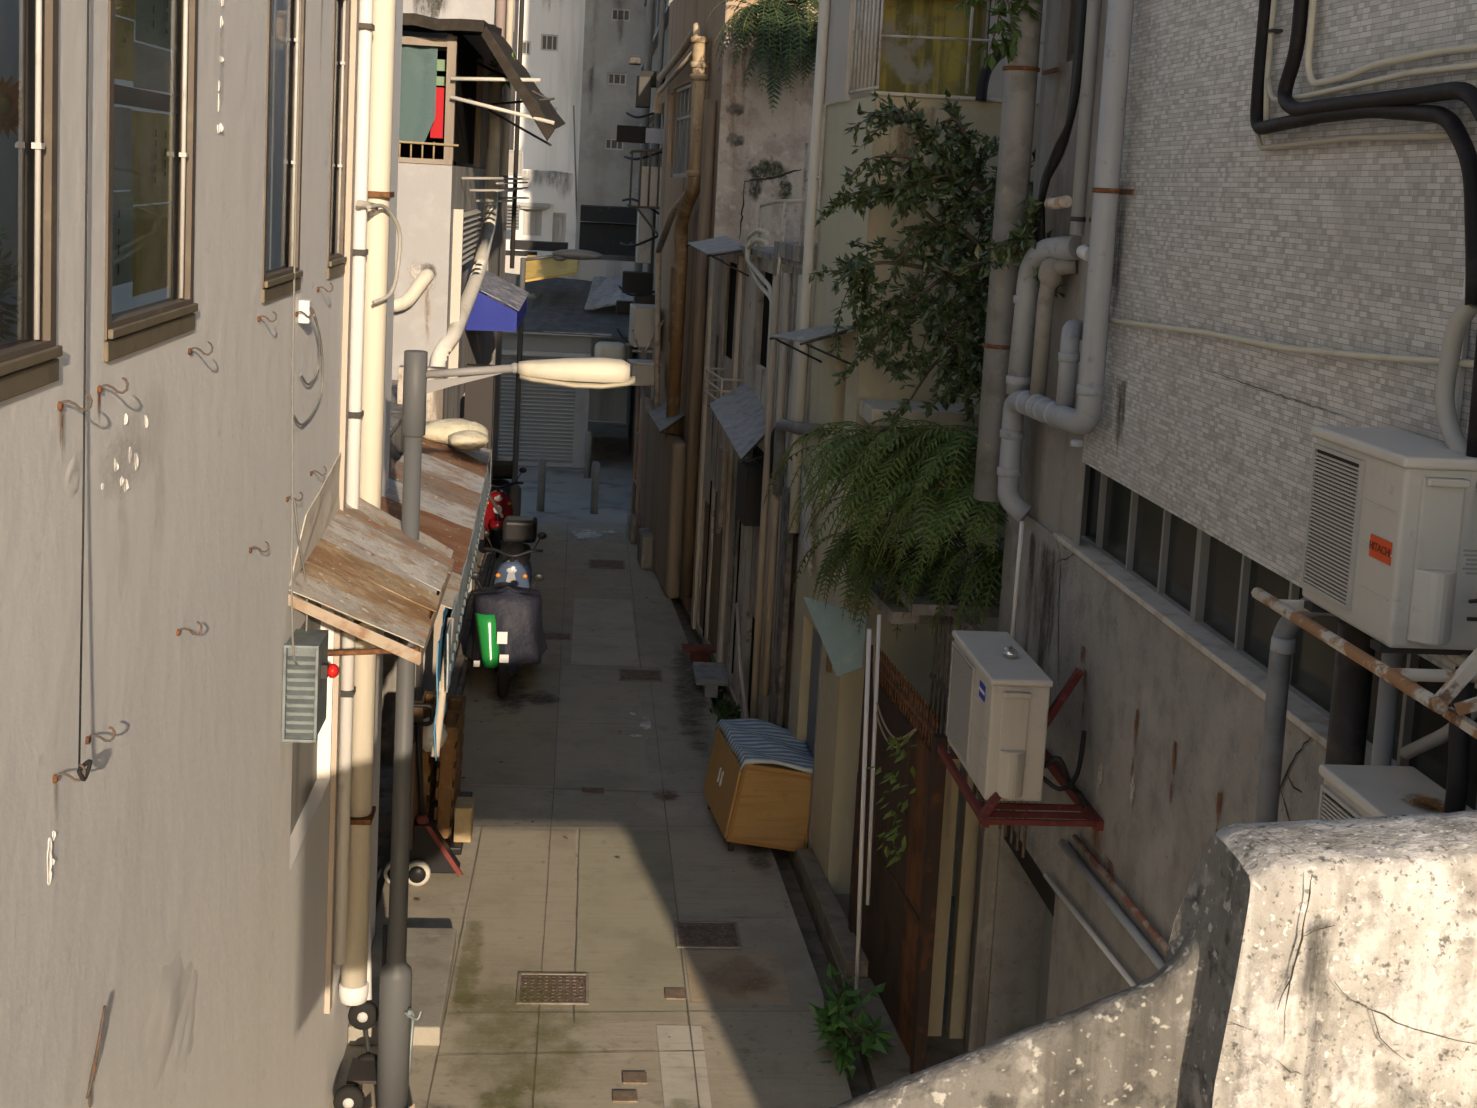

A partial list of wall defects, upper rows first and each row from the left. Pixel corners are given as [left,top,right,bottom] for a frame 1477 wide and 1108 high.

crack [1226,737,1335,1075]
crack [1334,981,1475,1061]